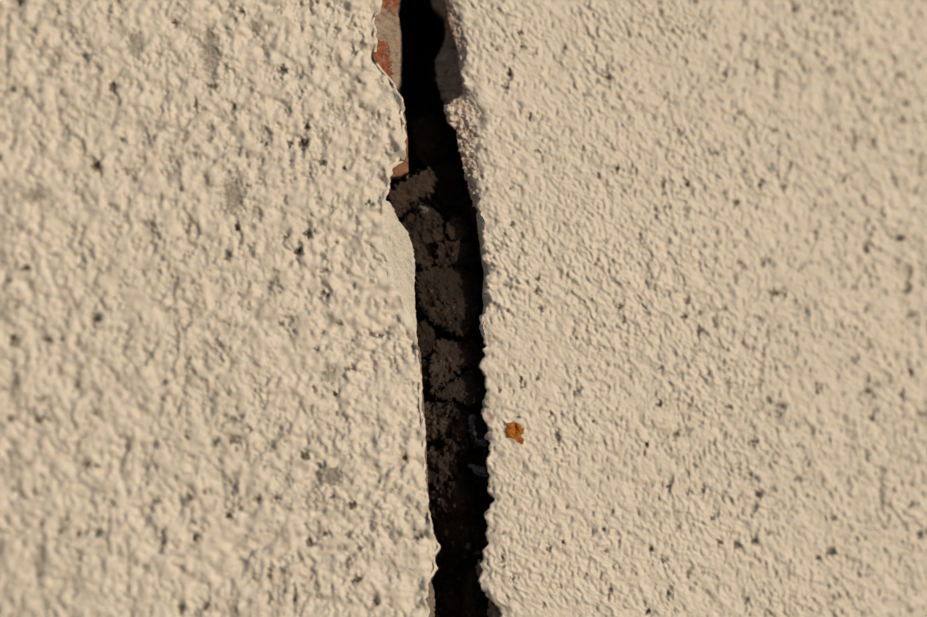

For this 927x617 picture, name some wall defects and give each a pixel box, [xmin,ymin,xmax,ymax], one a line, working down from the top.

spalling [374,0,401,93]
spalling [390,113,409,181]
crack [386,0,494,617]
spalling [430,0,491,335]